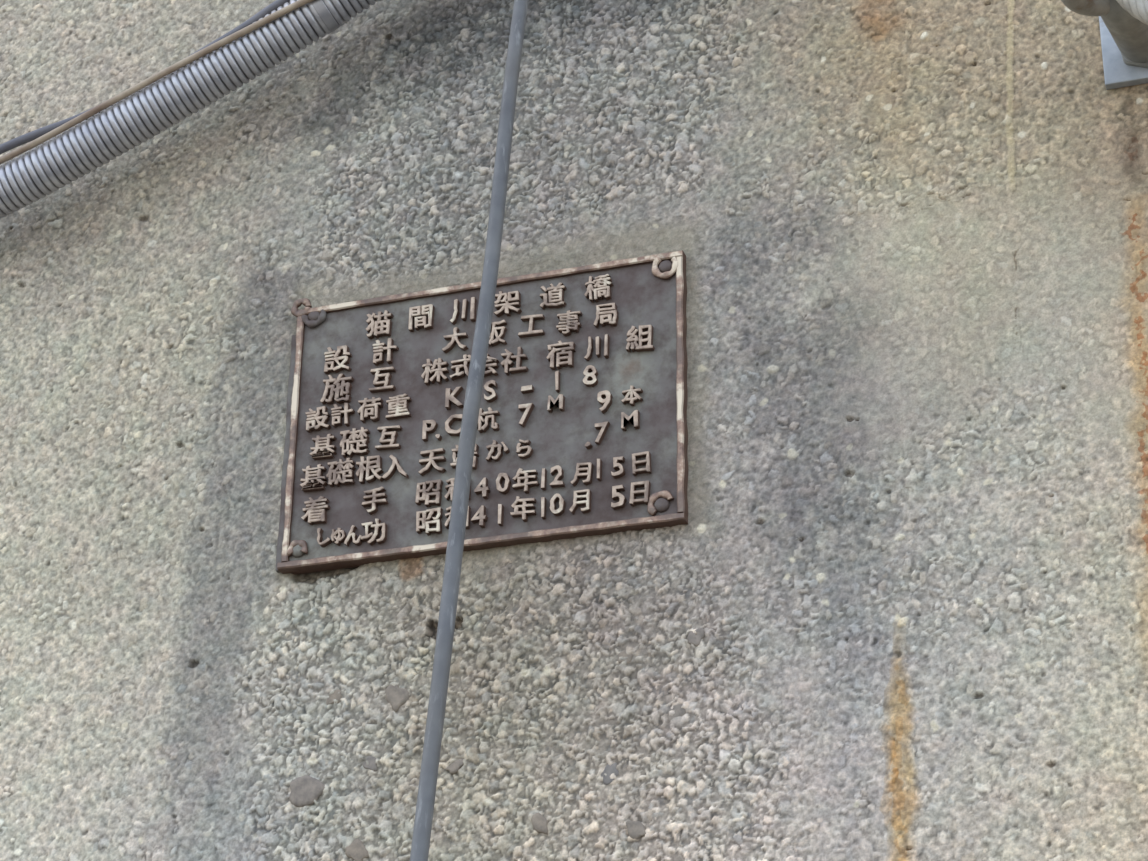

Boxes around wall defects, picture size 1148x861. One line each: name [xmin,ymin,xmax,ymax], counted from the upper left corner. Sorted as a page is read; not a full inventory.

rust [835,0,944,191]
rust [1109,190,1148,804]
rust [878,615,924,861]